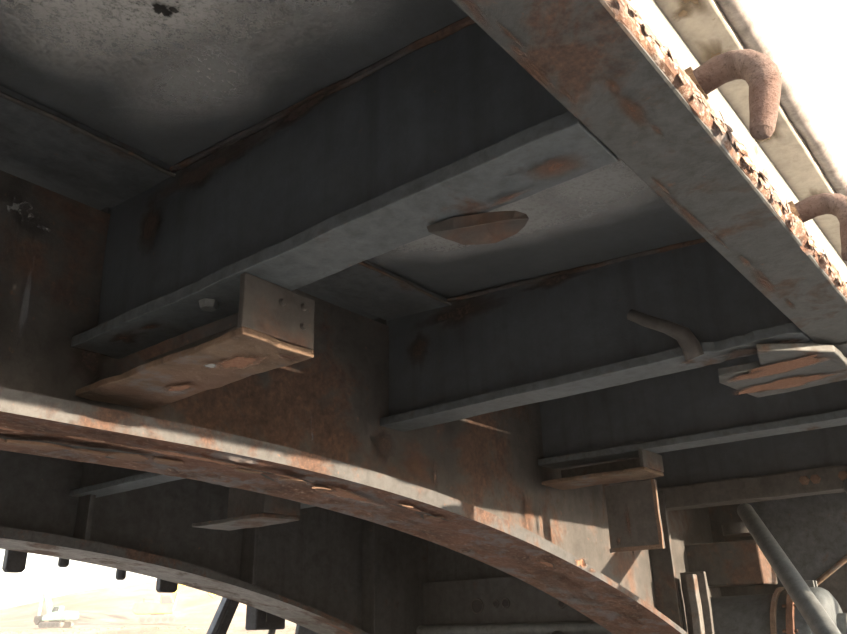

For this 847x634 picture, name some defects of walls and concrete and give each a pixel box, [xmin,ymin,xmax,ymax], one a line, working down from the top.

corrosion [605,0,847,299]
corrosion [730,354,839,395]
corrosion [65,435,252,469]
crack [234,466,332,491]
crack [390,503,452,522]